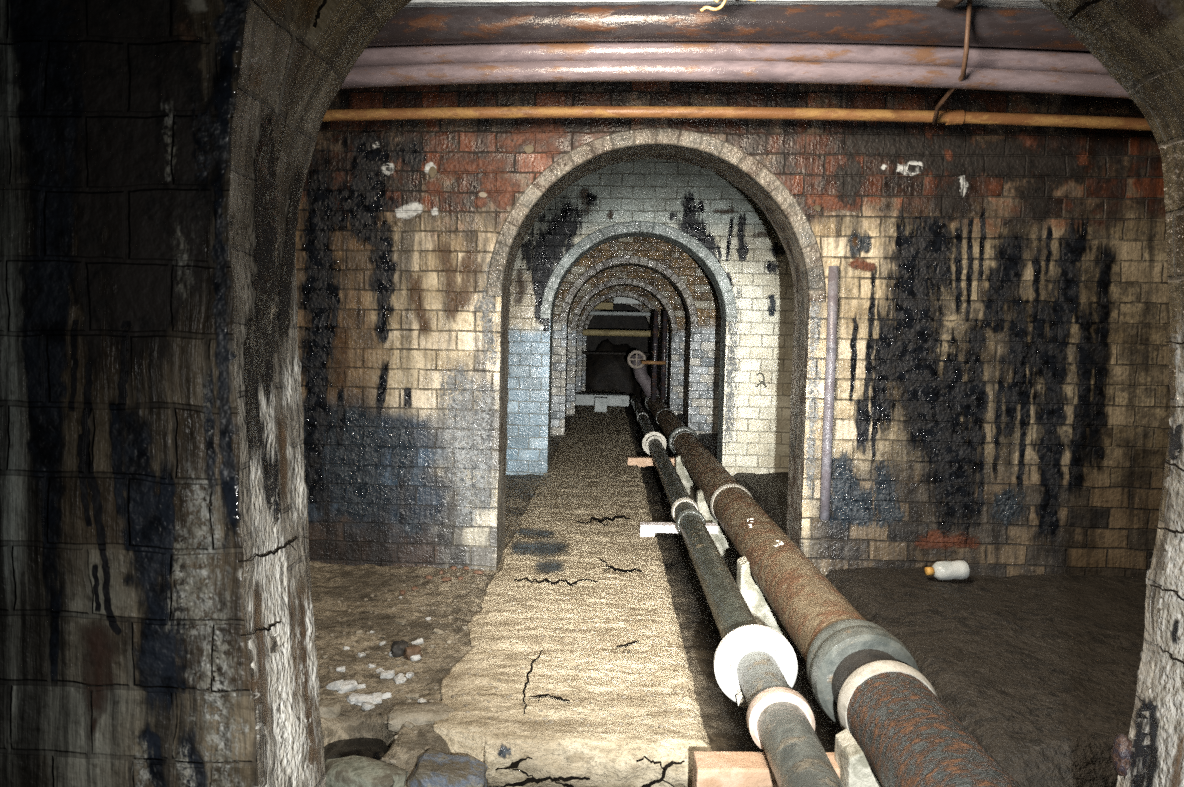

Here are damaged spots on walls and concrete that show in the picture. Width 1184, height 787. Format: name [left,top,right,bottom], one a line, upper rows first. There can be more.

leakage [881,161,923,176]
leakage [369,202,439,343]
leakage [433,243,500,365]
leakage [922,174,1053,527]
leakage [830,304,905,528]
leakage [134,311,321,787]
crack [239,537,312,563]
crack [1150,585,1184,601]
crack [523,650,570,714]
crack [1160,646,1184,664]
crack [495,757,590,787]
crack [636,755,685,787]